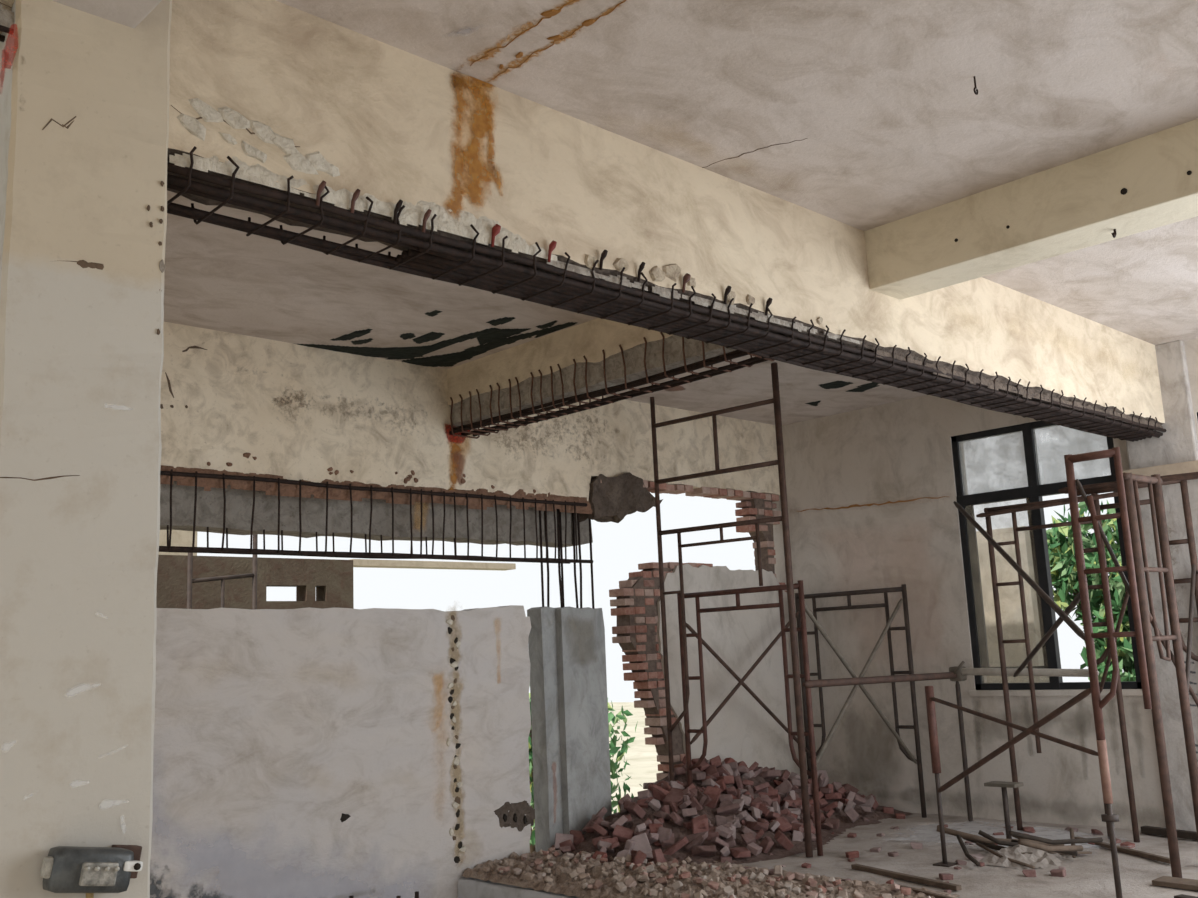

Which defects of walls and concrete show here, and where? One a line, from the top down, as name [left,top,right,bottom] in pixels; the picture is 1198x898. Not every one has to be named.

spalling [0,2,14,42]
crack [42,116,76,130]
rust [446,73,502,215]
spalling [147,98,1166,442]
crack [0,474,80,482]
spalling [160,453,663,523]
rust [445,424,470,490]
water stain [150,877,174,898]